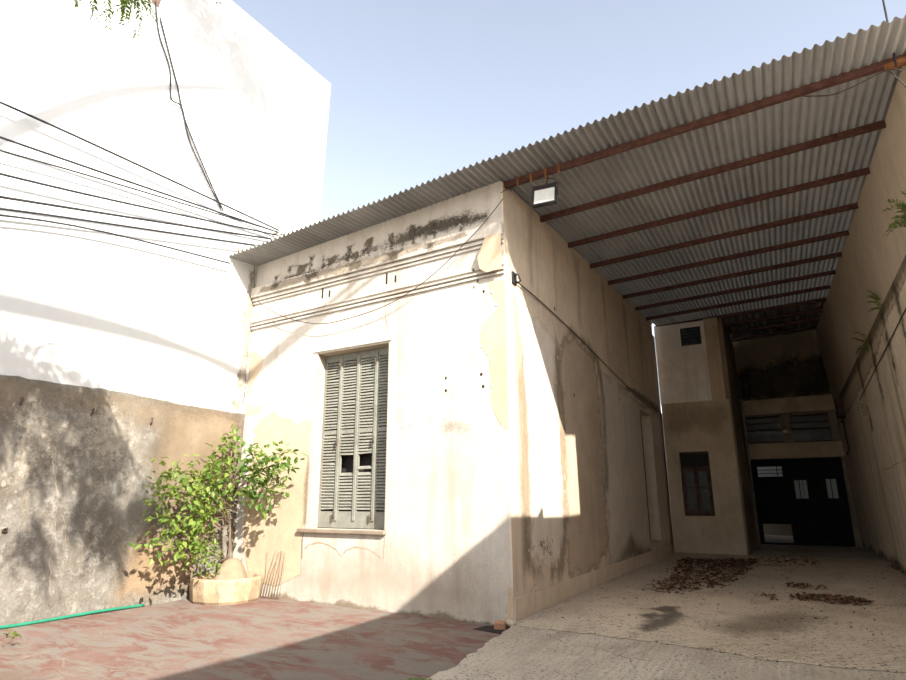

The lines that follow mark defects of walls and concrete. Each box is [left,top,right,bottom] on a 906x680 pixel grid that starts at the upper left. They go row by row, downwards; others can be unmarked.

peeling [232,271,313,586]
water stain [260,209,487,293]
peeling [472,233,509,429]
water stain [519,346,568,579]